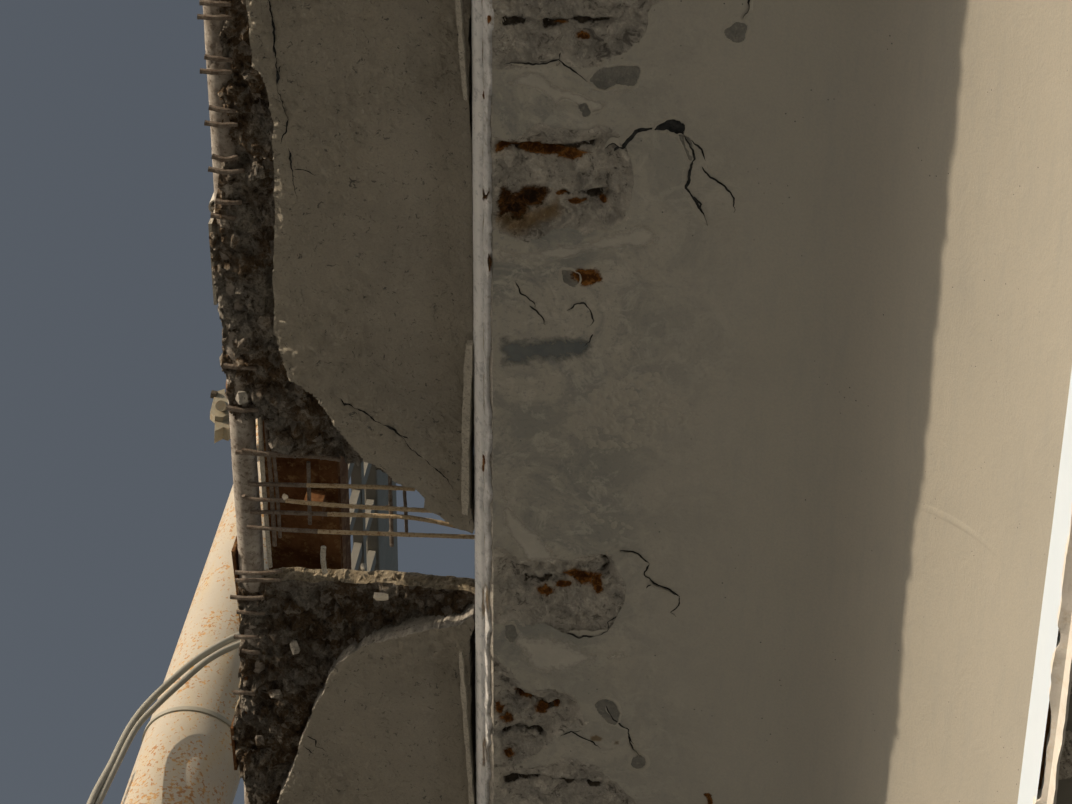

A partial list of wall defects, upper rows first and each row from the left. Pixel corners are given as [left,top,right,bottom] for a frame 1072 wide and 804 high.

spalling [492,0,663,92]
spalling [492,102,634,242]
crack [604,122,659,151]
peeling [652,116,685,137]
crack [680,137,735,225]
crack [515,283,594,347]
rust [570,269,603,286]
spalling [197,0,475,804]
spalling [493,546,626,643]
crack [620,550,680,616]
spalling [493,654,638,804]